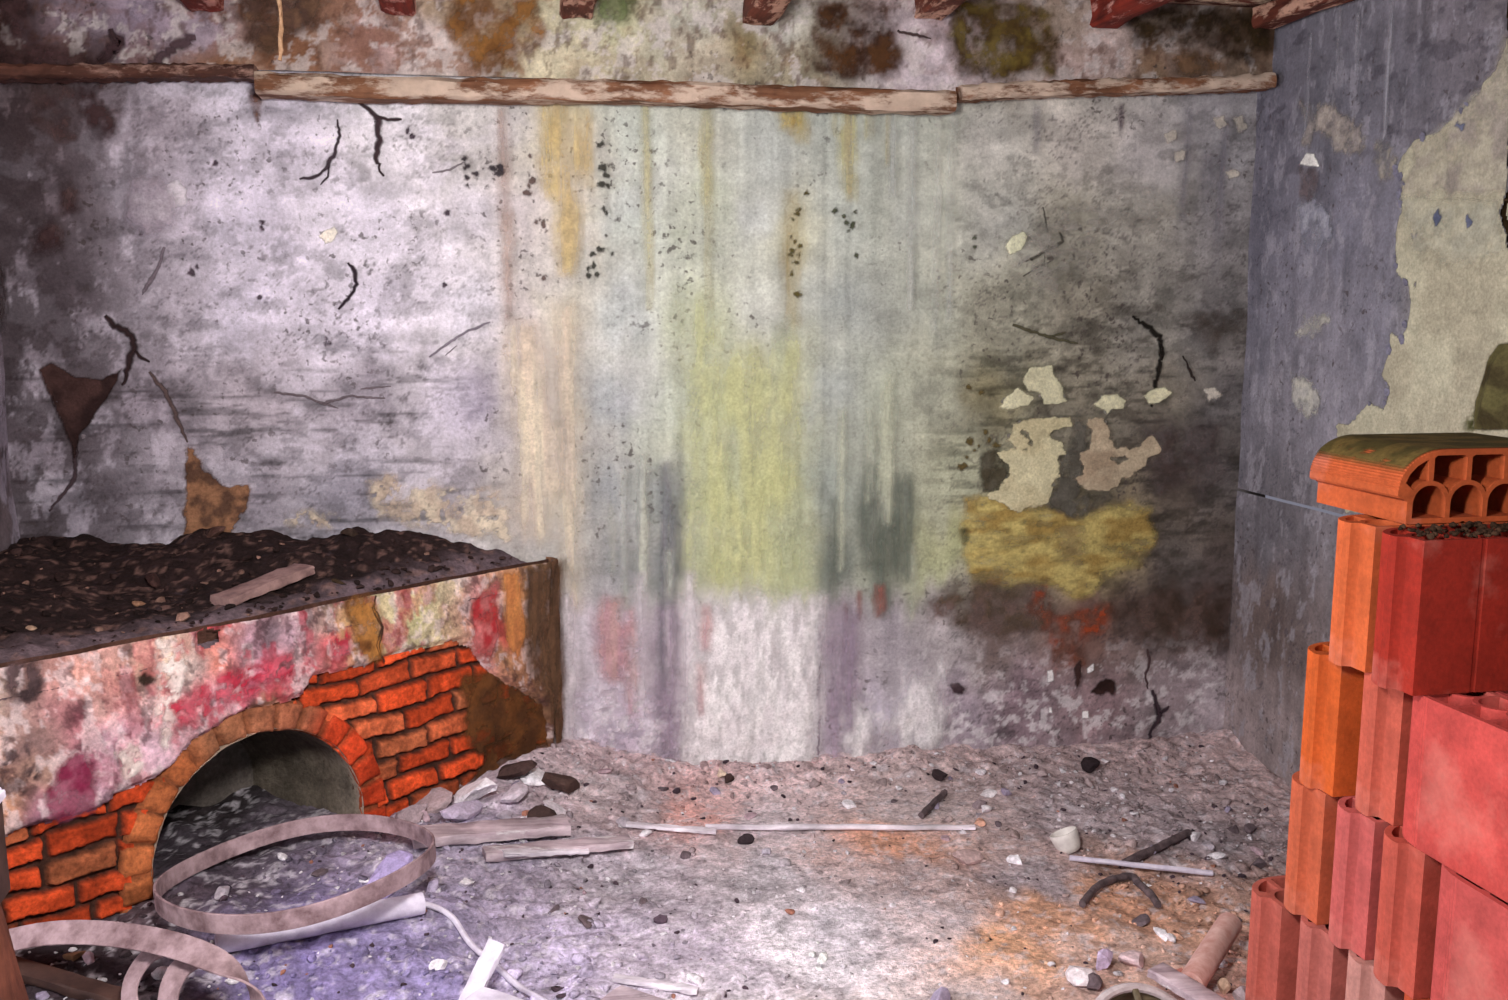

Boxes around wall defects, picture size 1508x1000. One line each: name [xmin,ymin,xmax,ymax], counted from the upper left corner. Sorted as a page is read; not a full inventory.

water stain [811,1,901,79]
water stain [948,0,1059,79]
crack [338,262,359,310]
crack [299,103,402,185]
peeling [1299,38,1508,437]
crack [1404,160,1508,248]
crack [1132,315,1196,407]
peeling [987,365,1161,513]
water stain [371,311,871,765]
water stain [931,420,1155,635]
spalling [293,640,487,817]
spalling [1,769,166,929]